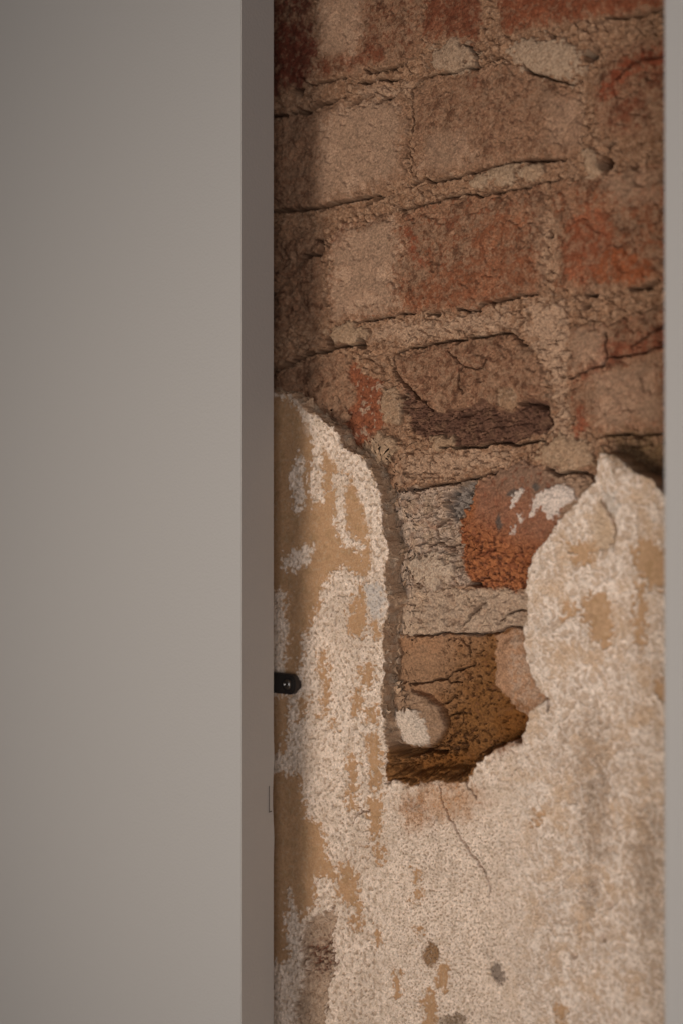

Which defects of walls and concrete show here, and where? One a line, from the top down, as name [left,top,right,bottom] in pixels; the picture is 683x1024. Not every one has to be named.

spalling [274,0,665,867]
peeling [552,999,570,1021]